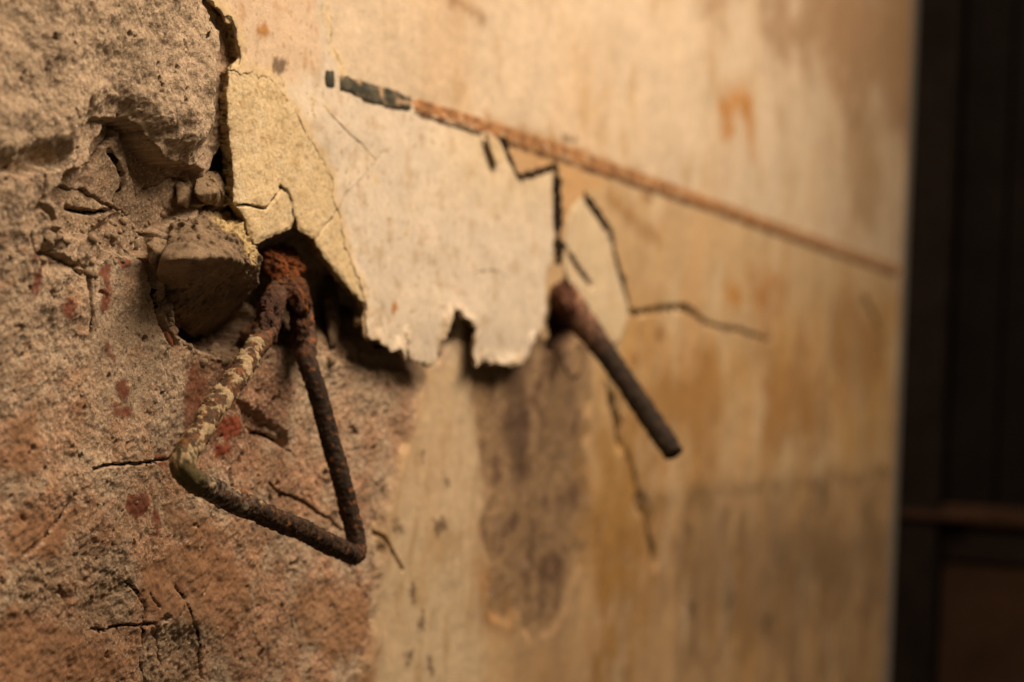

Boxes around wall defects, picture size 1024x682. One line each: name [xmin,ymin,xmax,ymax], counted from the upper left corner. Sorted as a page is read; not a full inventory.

crack [413,112,770,344]
rust [256,246,318,349]
spalling [0,0,628,682]
rust [550,279,579,322]
crack [95,459,160,468]
crack [91,581,159,668]
crack [175,589,201,673]